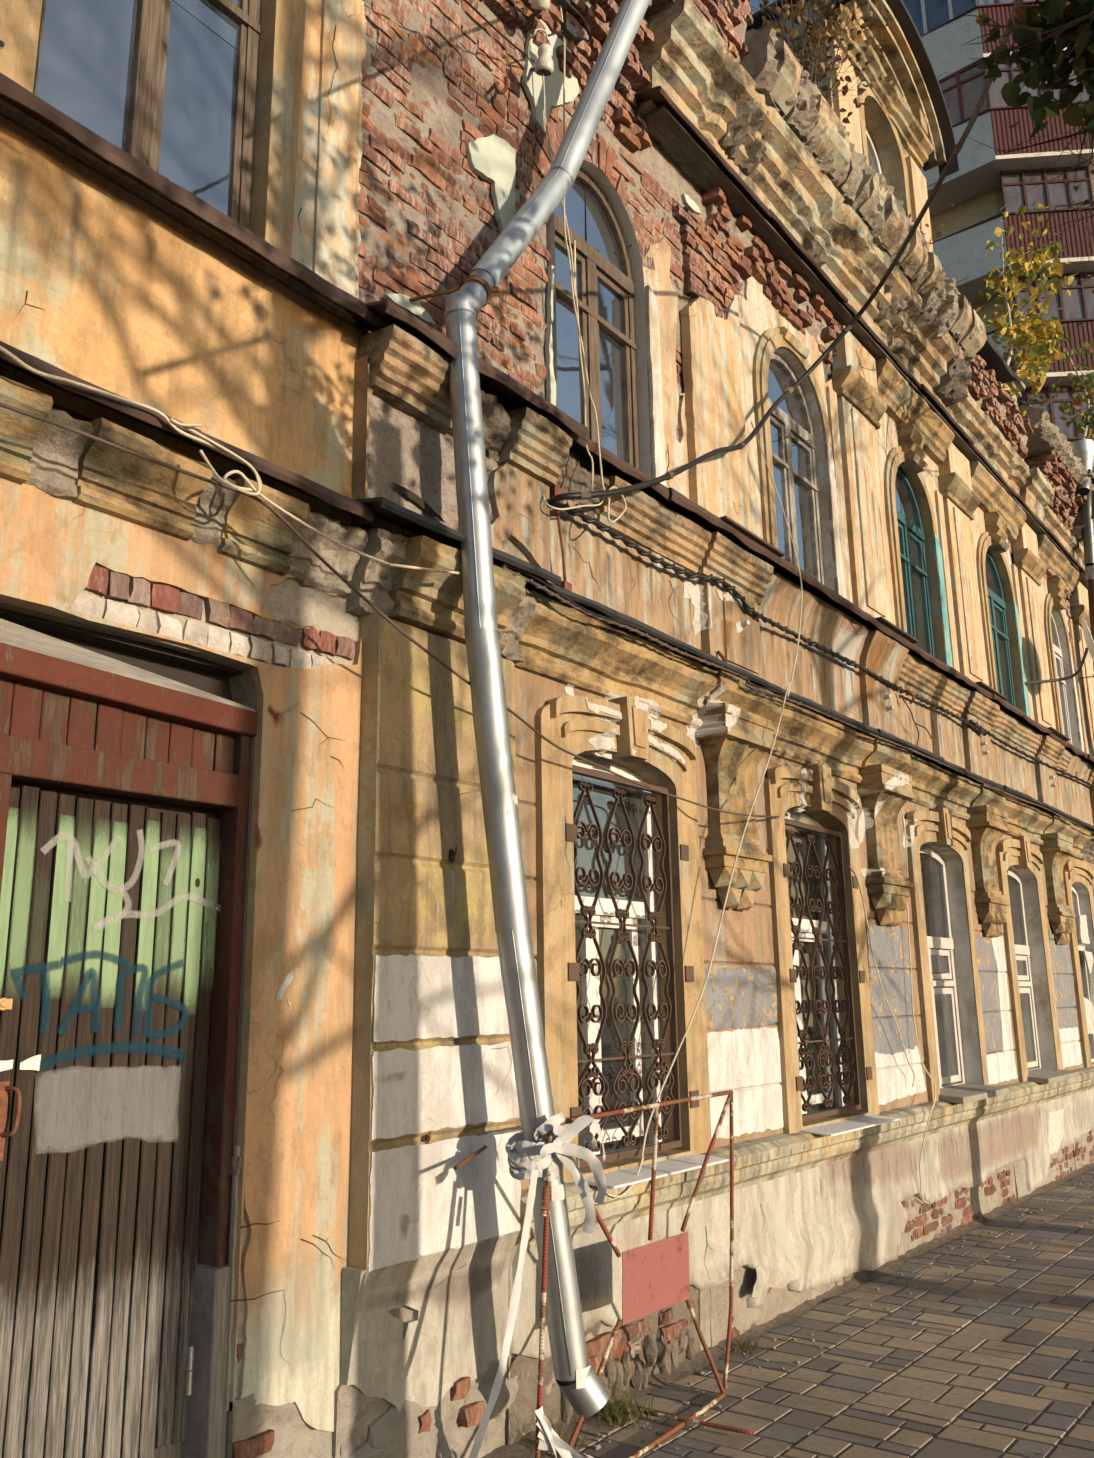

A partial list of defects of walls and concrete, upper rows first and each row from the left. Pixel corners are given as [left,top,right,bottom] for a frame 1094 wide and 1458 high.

flaking render [357,0,580,336]
flaking render [476,218,551,400]
flaking render [584,117,745,397]
flaking render [70,565,360,669]
flaking render [898,1109,1094,1256]
flaking render [225,1145,579,1458]
flaking render [584,1267,869,1403]